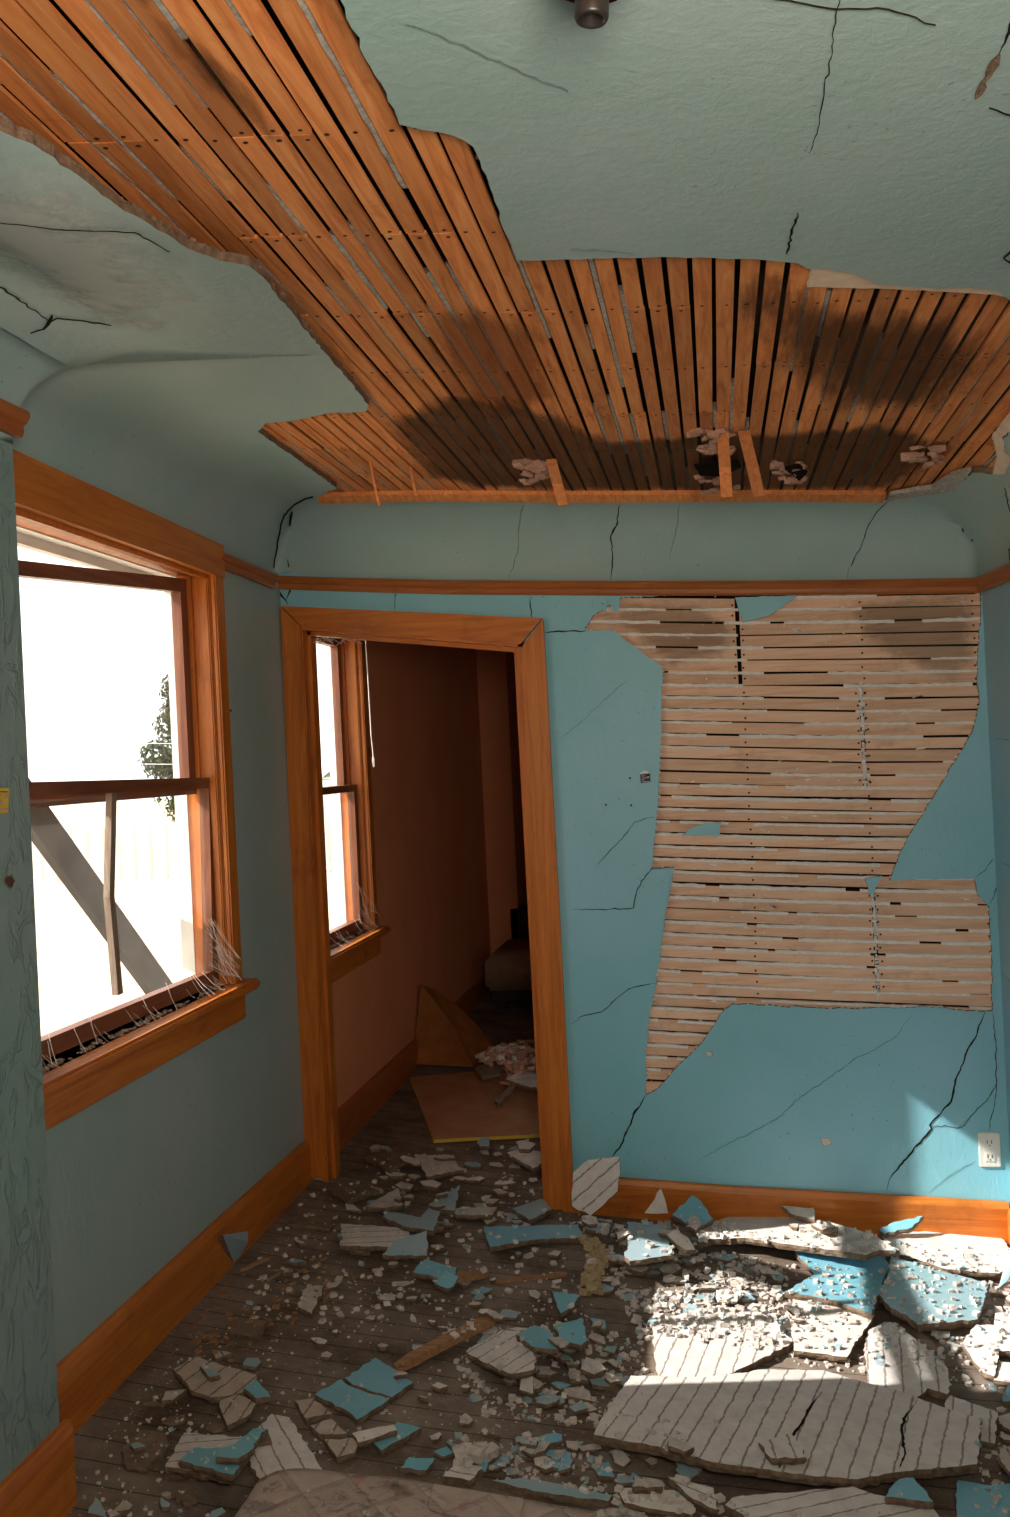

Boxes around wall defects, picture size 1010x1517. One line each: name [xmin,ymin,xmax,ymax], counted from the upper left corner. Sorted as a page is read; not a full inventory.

crack [406,23,568,92]
crack [778,0,936,152]
crack [975,23,1010,116]
crack [0,223,170,252]
flaking render [0,0,1010,507]
crack [786,213,799,254]
crack [0,287,111,334]
flaking render [585,593,993,1094]
crack [571,867,674,910]
crack [572,983,656,1024]
crack [701,1016,911,1159]
crack [613,1096,645,1156]